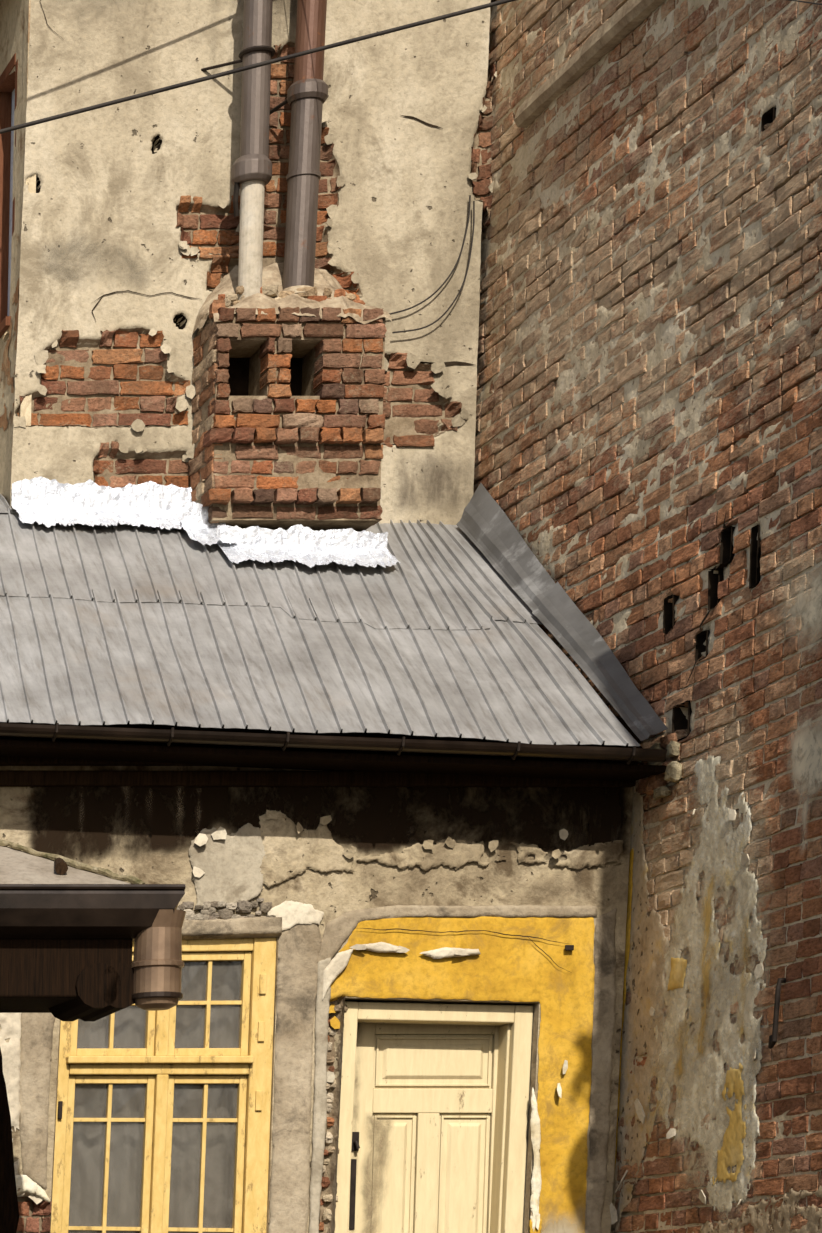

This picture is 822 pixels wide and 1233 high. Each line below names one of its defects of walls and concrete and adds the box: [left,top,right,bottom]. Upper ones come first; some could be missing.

flaking render [176,195,240,291]
flaking render [263,41,295,267]
flaking render [315,111,362,300]
flaking render [0,277,196,488]
flaking render [382,352,469,447]
peeling [0,1013,22,1142]
peeling [189,755,822,1233]
flaking render [14,1159,52,1233]